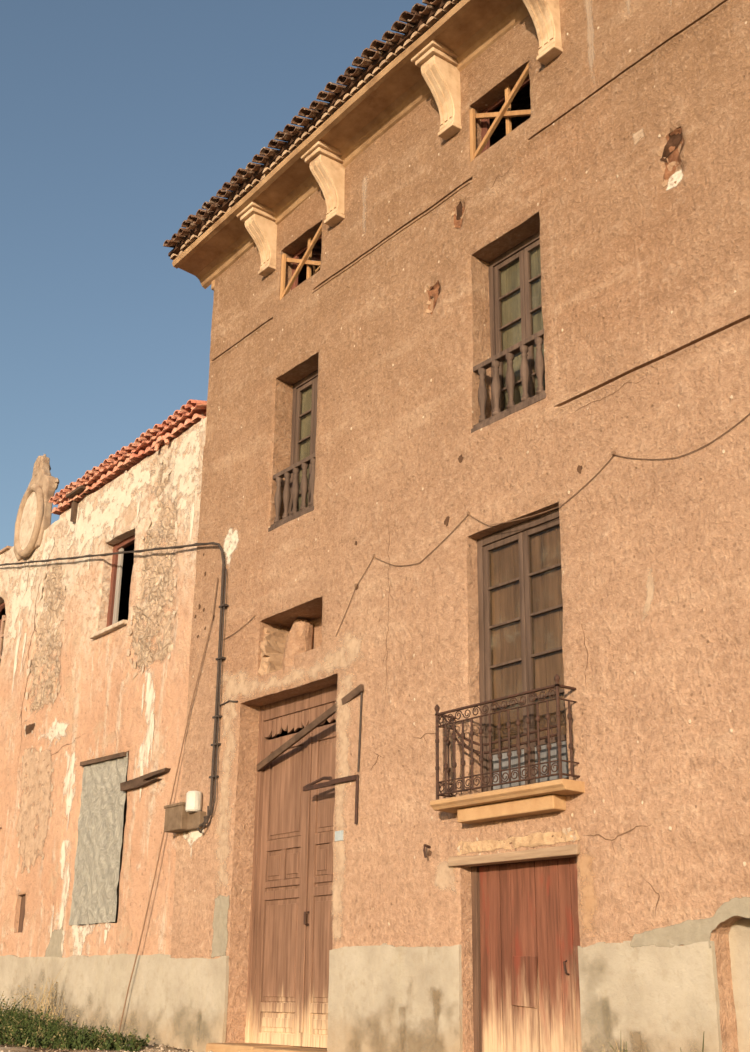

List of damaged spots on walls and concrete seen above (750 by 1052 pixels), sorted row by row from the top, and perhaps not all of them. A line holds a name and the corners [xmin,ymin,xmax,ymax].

spalling [658,126,684,187]
spalling [451,199,467,228]
spalling [425,280,441,314]
spalling [8,418,203,874]
damp [137,672,155,798]
damp [50,751,110,956]
crack [498,824,652,854]